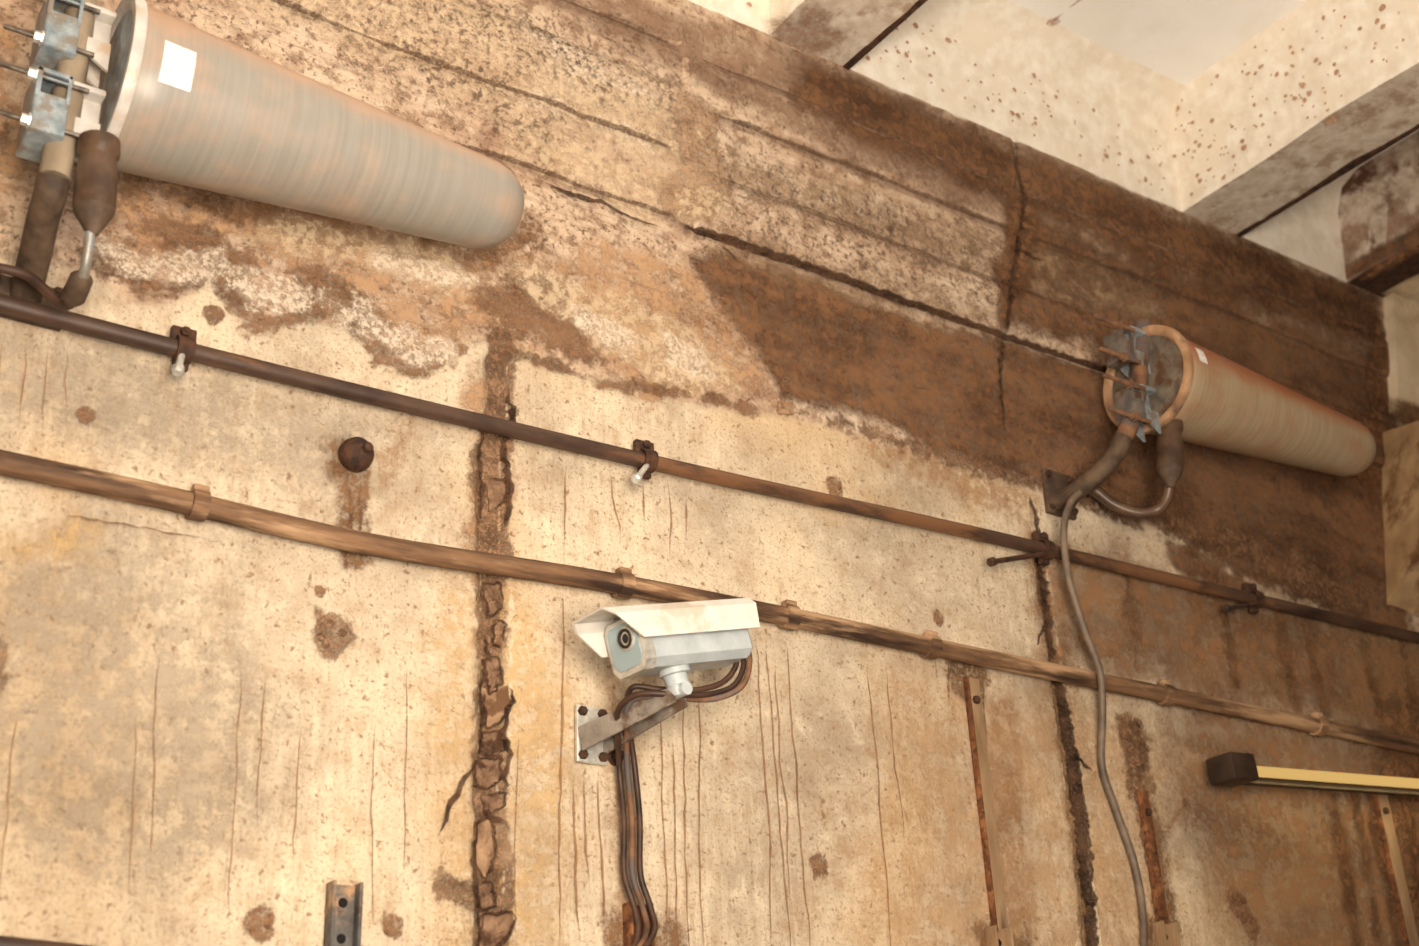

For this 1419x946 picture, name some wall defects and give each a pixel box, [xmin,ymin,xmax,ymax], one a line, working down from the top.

leakage [0,28,28,188]
rust [326,438,371,532]
rust [341,550,373,568]
crack [477,393,516,523]
leakage [78,0,1419,739]
crack [551,144,1107,423]
rust [243,906,274,943]
crack [441,580,516,946]
leakage [508,605,605,925]
rust [945,661,991,704]
crack [1029,498,1099,946]
rust [1115,713,1181,946]